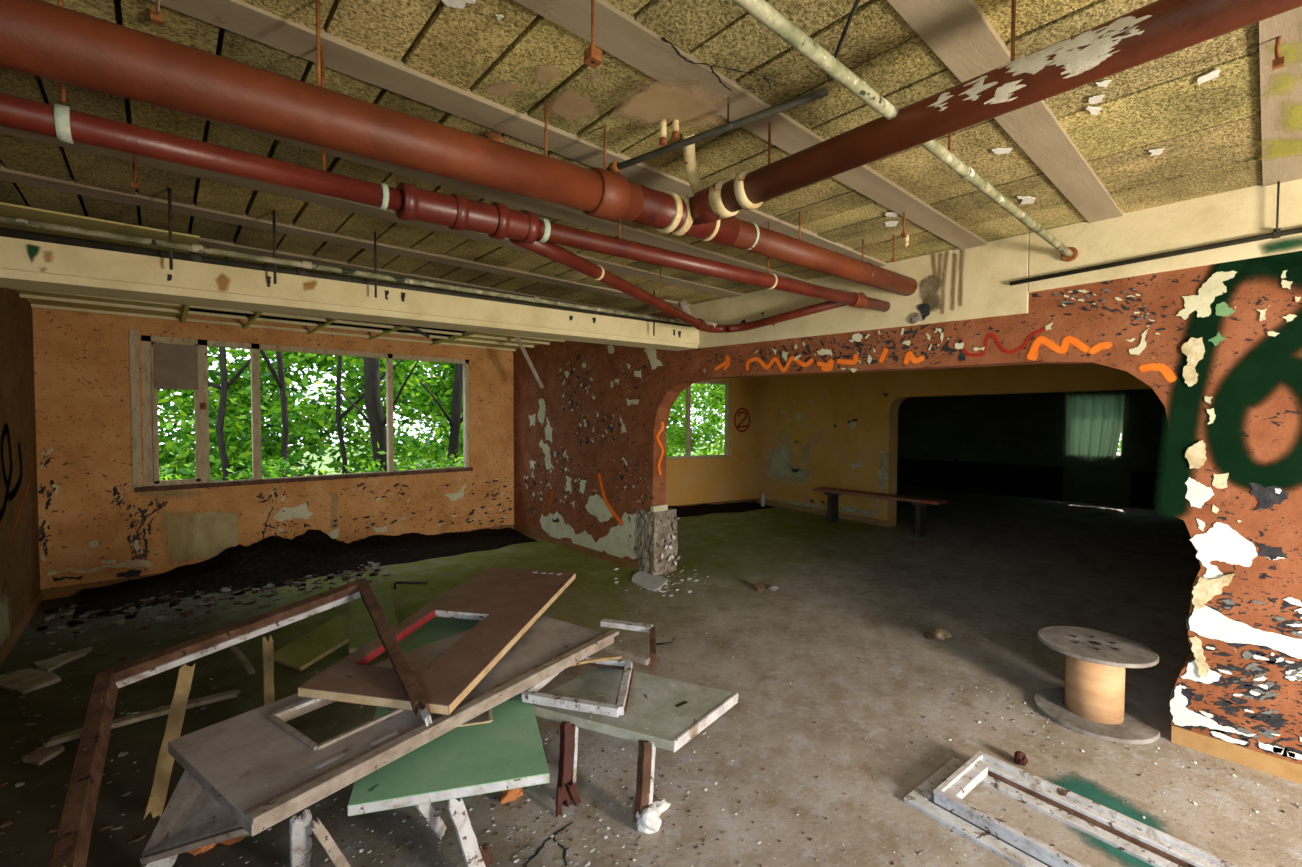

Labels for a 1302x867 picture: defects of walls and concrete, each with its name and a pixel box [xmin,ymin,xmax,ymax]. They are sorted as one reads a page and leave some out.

peeling [927,15,1152,115]
peeling [1197,68,1220,85]
peeling [748,304,985,372]
peeling [1052,287,1166,355]
peeling [1176,270,1237,424]
peeling [1256,270,1301,337]
spalling [328,345,714,596]
peeling [1167,440,1302,761]
crack [523,822,574,867]